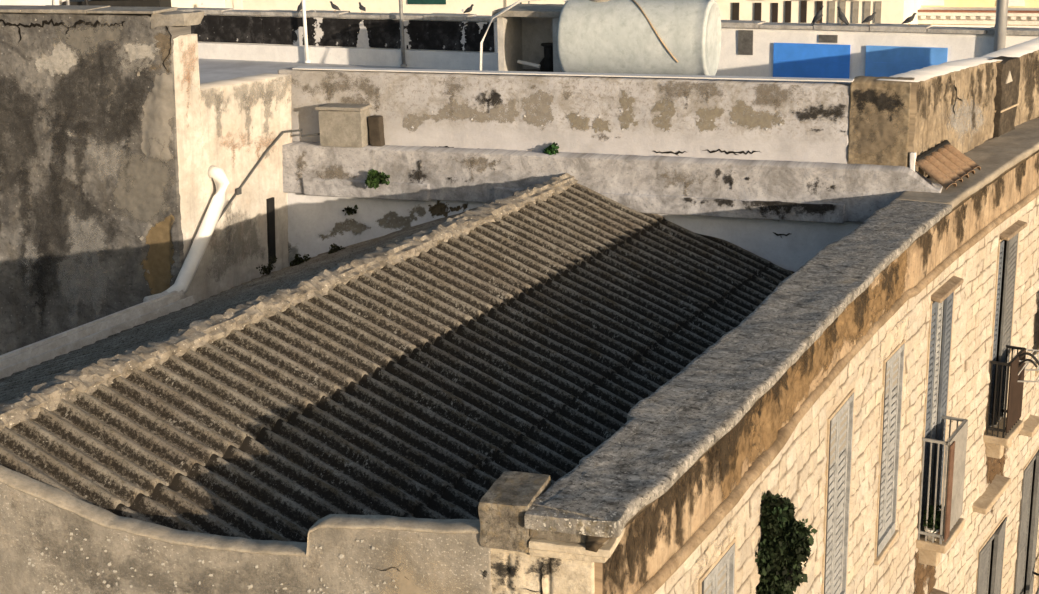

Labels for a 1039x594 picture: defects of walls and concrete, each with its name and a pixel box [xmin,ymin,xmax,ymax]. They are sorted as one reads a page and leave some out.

crack [0,19,125,42]
peeling [403,89,553,132]
peeling [566,90,638,133]
peeling [651,99,676,132]
peeling [696,100,785,132]
crack [654,148,760,156]
leakage [0,46,152,325]
flaking render [112,150,175,295]
leakage [603,317,839,594]
crack [527,565,543,594]